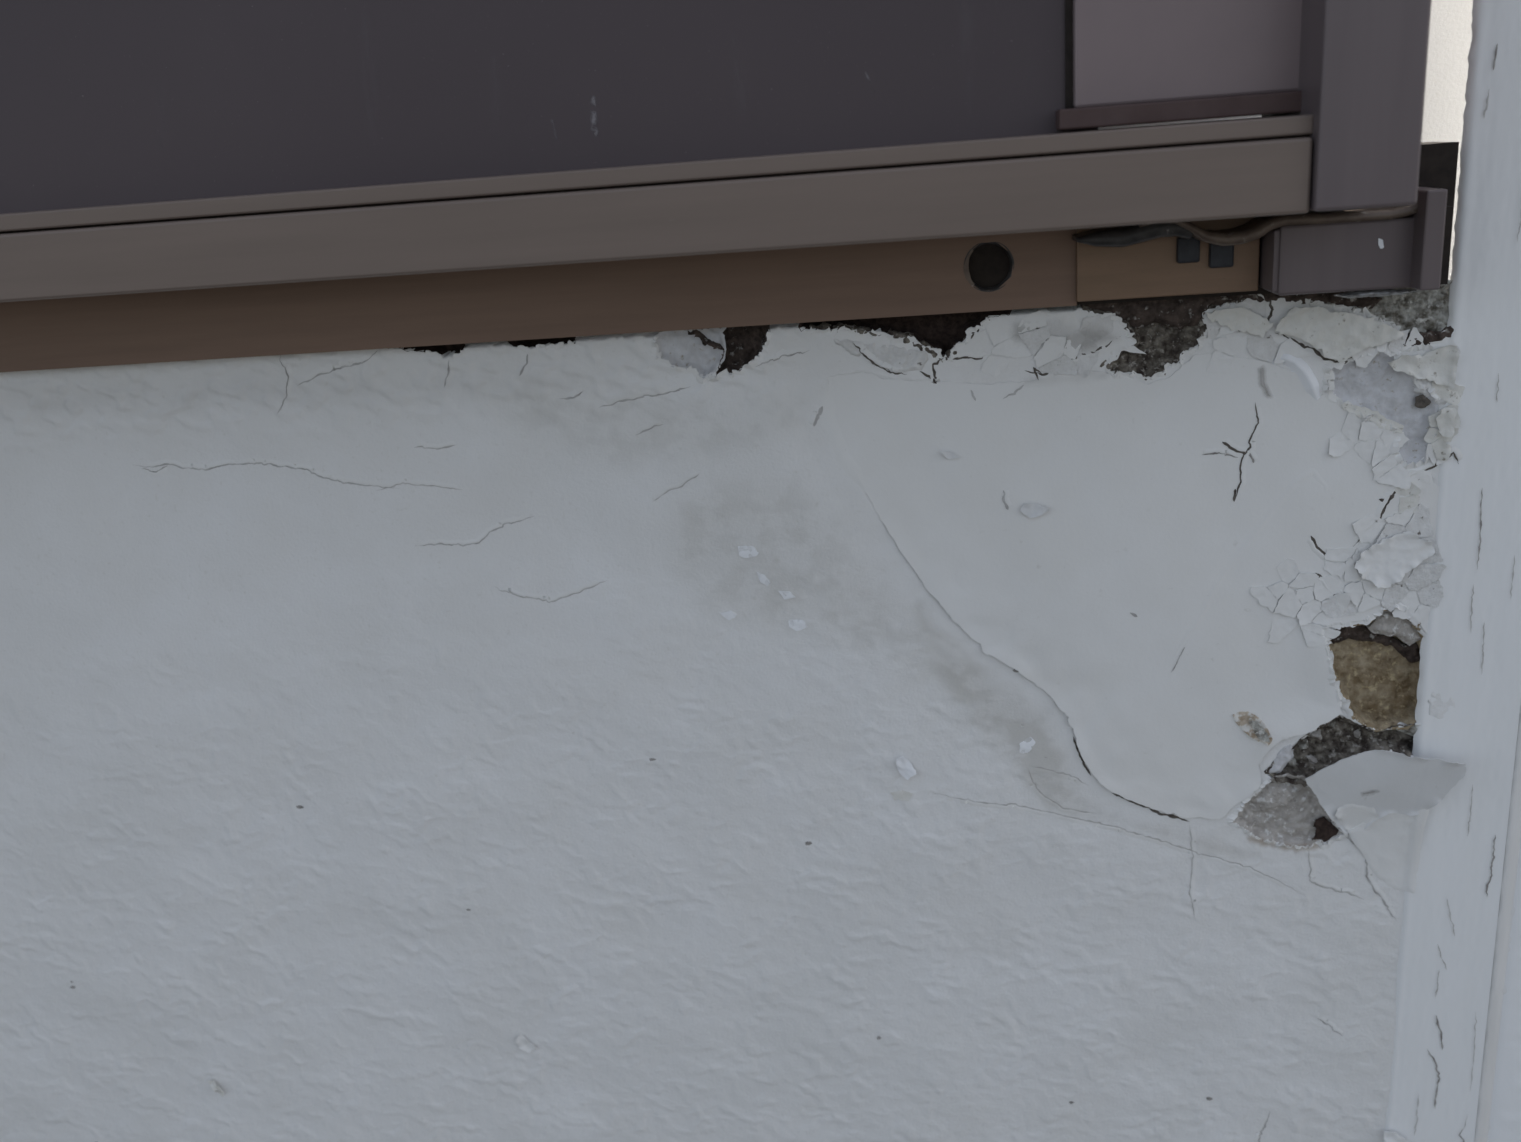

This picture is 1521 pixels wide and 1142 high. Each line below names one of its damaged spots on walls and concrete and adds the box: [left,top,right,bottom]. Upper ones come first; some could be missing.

crack [278,350,378,412]
crack [560,383,691,435]
spalling [651,325,774,384]
crack [135,441,462,490]
crack [1203,294,1515,668]
crack [418,515,533,547]
crack [496,580,608,603]
peeling [798,306,1459,850]